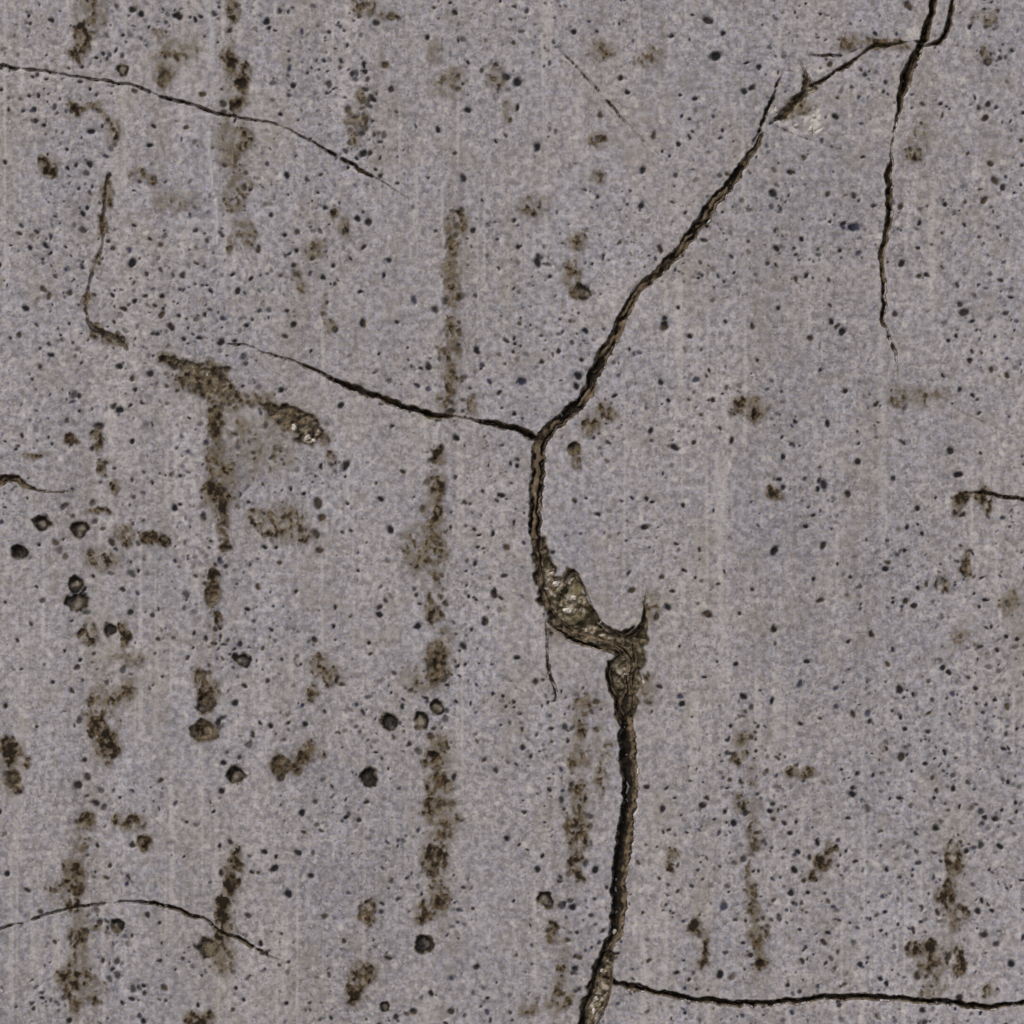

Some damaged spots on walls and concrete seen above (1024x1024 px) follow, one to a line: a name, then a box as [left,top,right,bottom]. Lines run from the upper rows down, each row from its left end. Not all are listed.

crack [0,64,374,178]
crack [84,175,128,350]
crack [0,474,73,493]
crack [272,0,1024,1024]
crack [1,903,102,930]
crack [128,878,272,959]